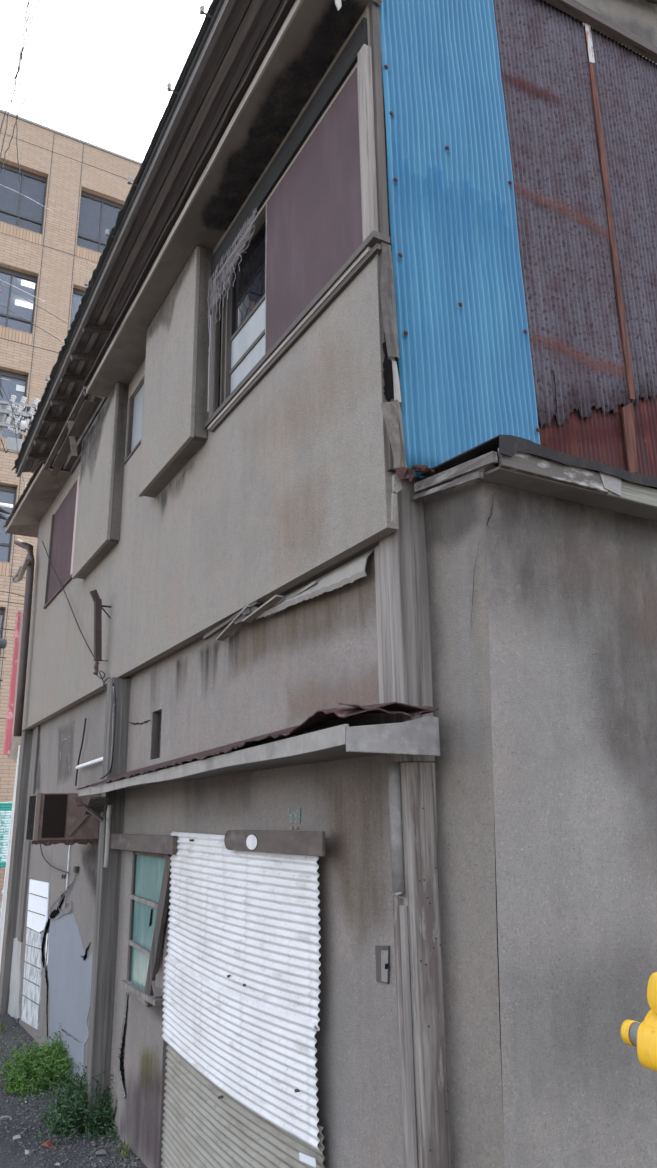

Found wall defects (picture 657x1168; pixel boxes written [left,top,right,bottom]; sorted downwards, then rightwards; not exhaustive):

peeling [381,245,415,521]
rust [538,395,657,478]
rust [76,702,439,790]
peeling [39,914,93,1077]
crack [113,993,128,1120]